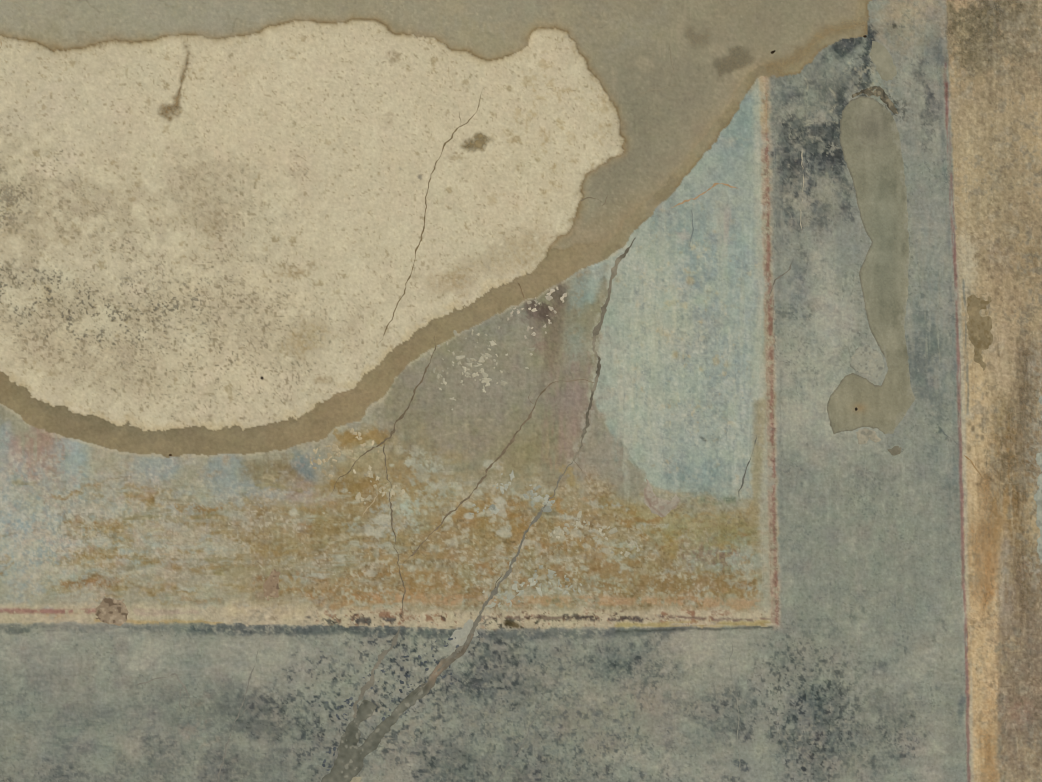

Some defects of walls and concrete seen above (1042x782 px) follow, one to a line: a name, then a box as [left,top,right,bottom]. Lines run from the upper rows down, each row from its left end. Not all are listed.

spalling [852,86,898,114]
crack [380,92,482,342]
peeling [420,287,567,410]
crack [329,238,635,718]
peeling [523,485,555,512]